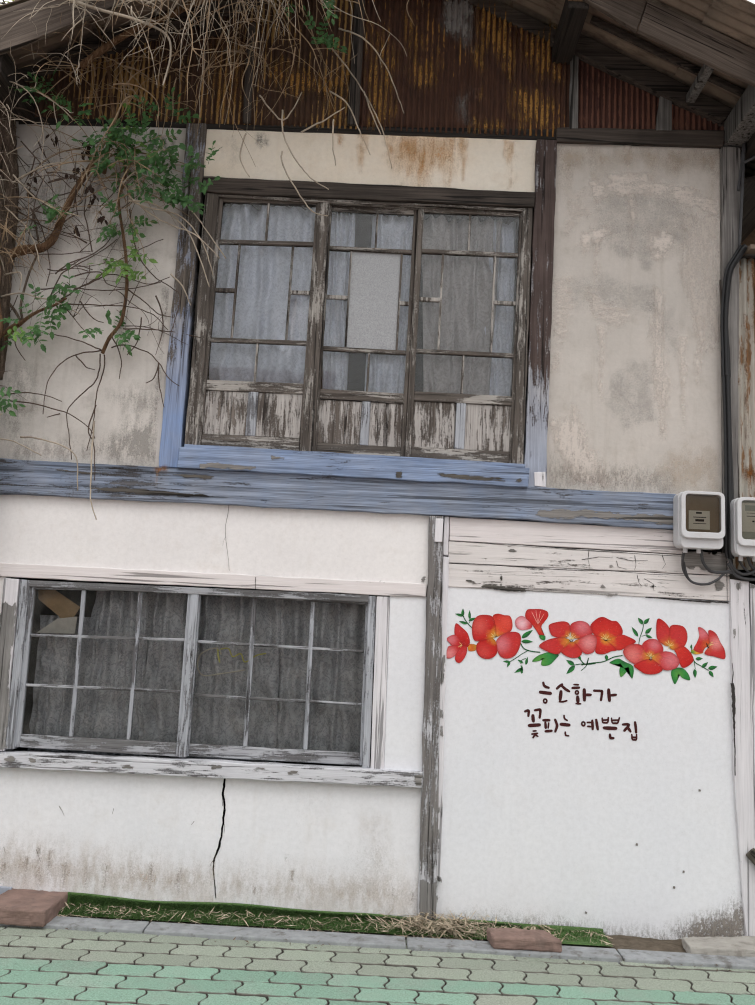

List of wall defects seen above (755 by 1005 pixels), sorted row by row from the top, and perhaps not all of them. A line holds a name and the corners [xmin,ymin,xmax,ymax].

peeling [174,462,256,480]
peeling [439,473,522,482]
peeling [91,486,212,497]
peeling [681,552,755,591]
peeling [466,576,526,592]
crack [210,779,226,898]
water stain [681,907,745,937]